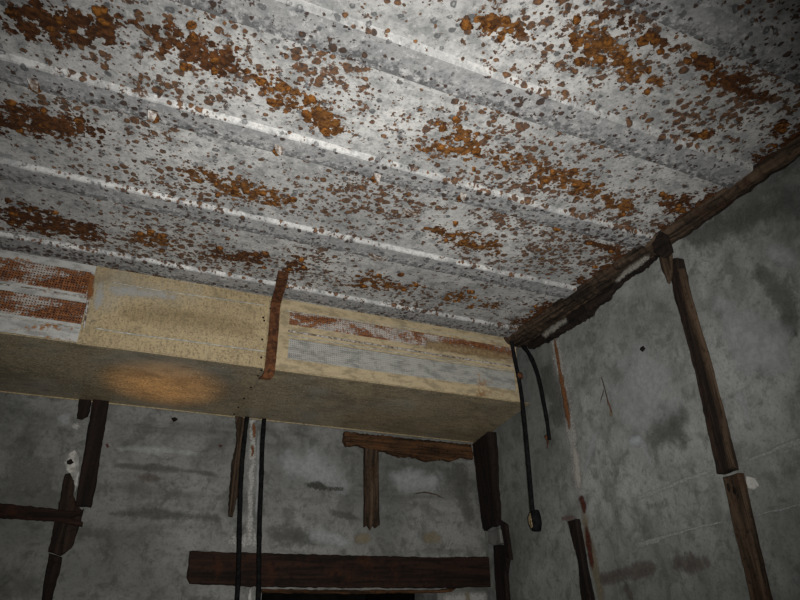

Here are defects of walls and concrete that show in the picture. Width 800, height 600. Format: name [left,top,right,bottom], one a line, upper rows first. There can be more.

rust [0,0,354,137]
rust [455,12,542,44]
rust [561,8,777,105]
rust [0,96,130,155]
rust [177,162,308,209]
rust [411,116,723,231]
rust [0,197,116,243]
rust [127,223,179,253]
rust [200,246,308,273]
rust [421,221,505,258]
rust [553,228,626,286]
rust [329,269,554,327]